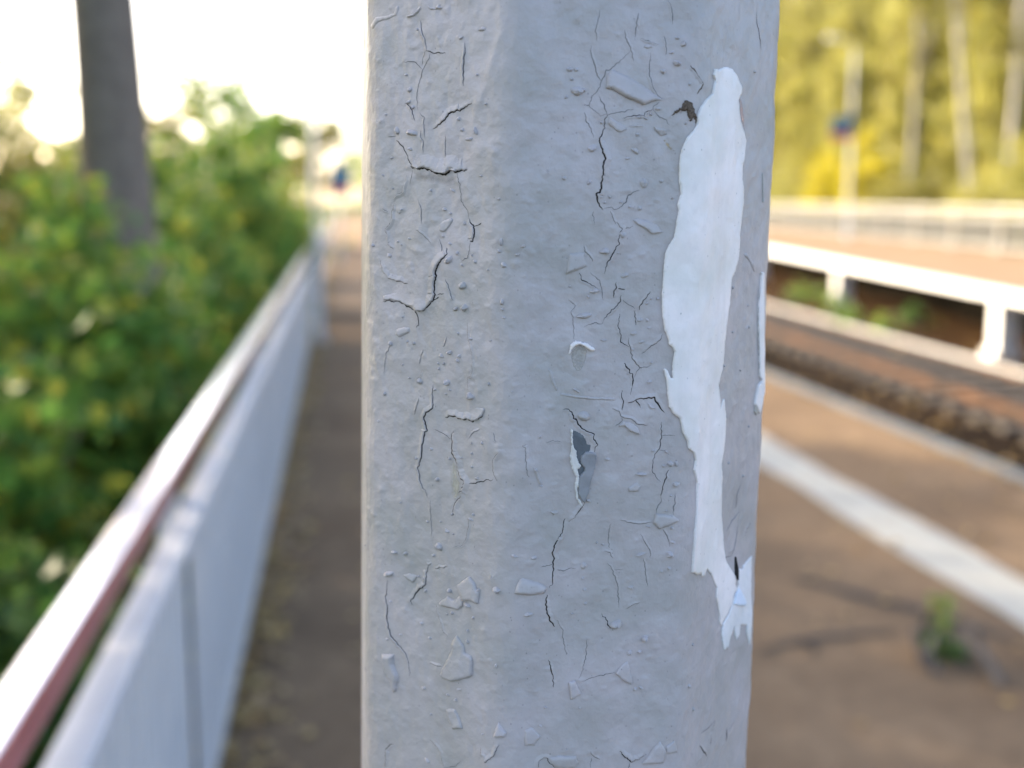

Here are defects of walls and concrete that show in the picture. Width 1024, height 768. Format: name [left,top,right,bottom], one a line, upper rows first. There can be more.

crack [689,66,704,94]
crack [380,0,677,687]
peeling [568,341,595,370]
peeling [633,67,752,650]
peeling [754,272,765,415]
peeling [570,429,582,506]